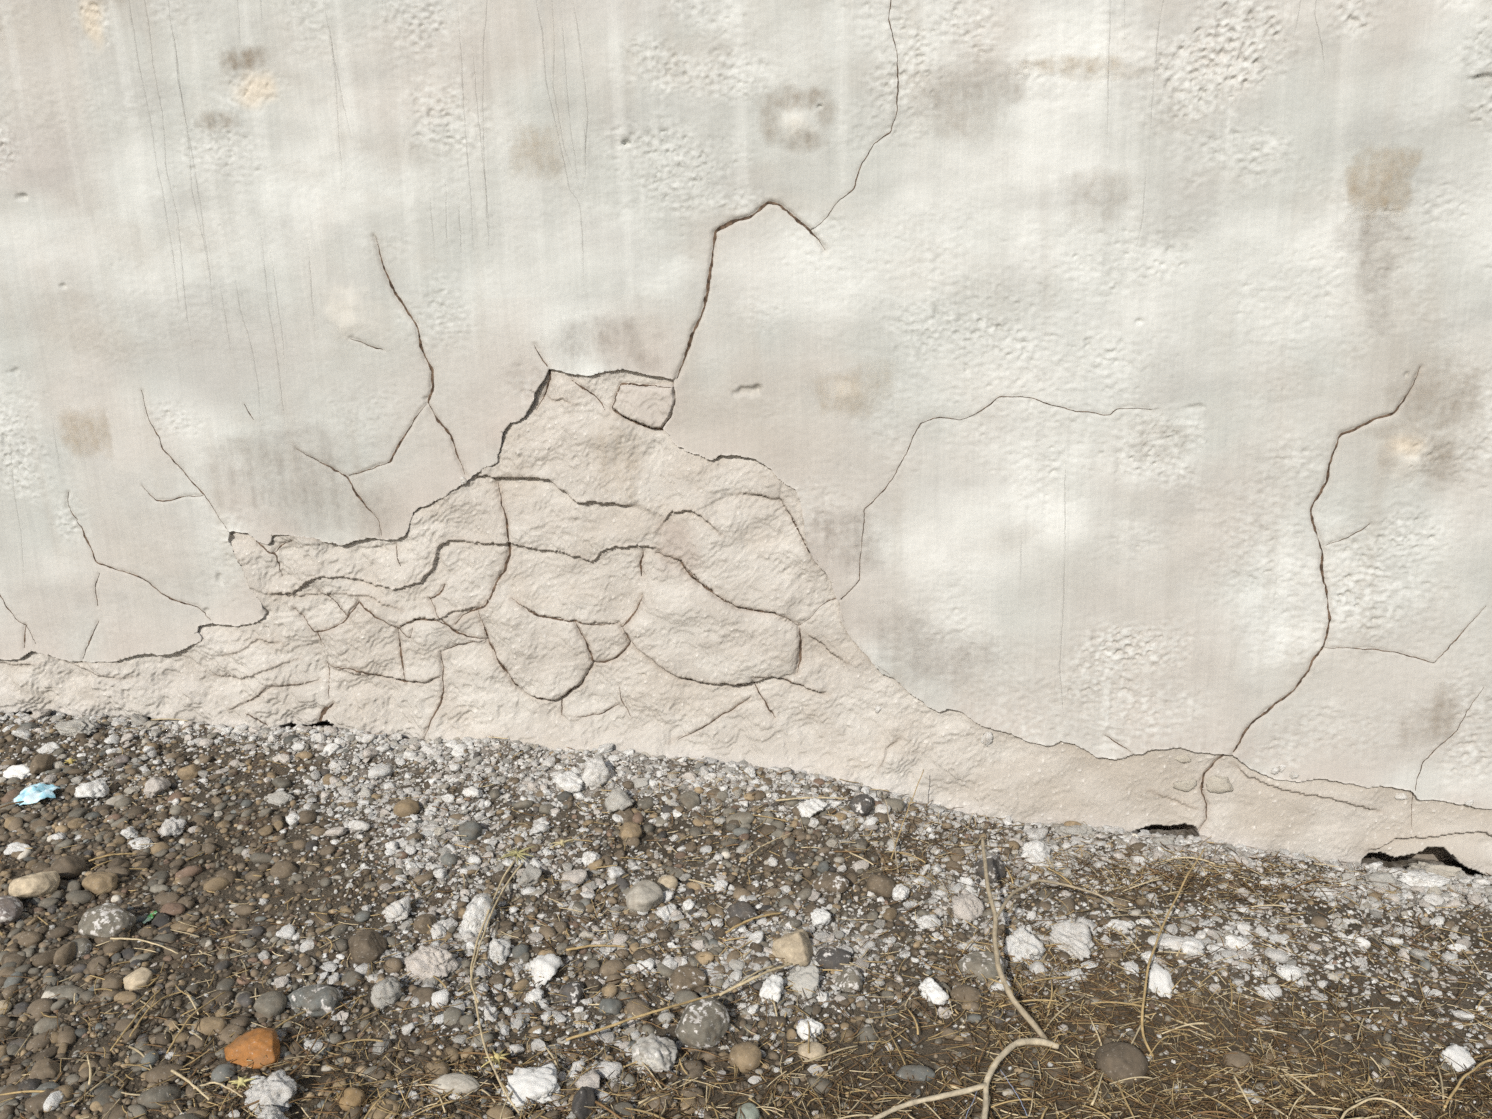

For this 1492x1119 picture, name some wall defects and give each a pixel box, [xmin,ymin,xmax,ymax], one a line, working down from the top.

crack [534,0,899,430]
crack [0,595,36,647]
crack [68,492,210,657]
crack [141,236,1152,740]
flaking render [0,369,1492,876]
crack [1199,366,1486,830]